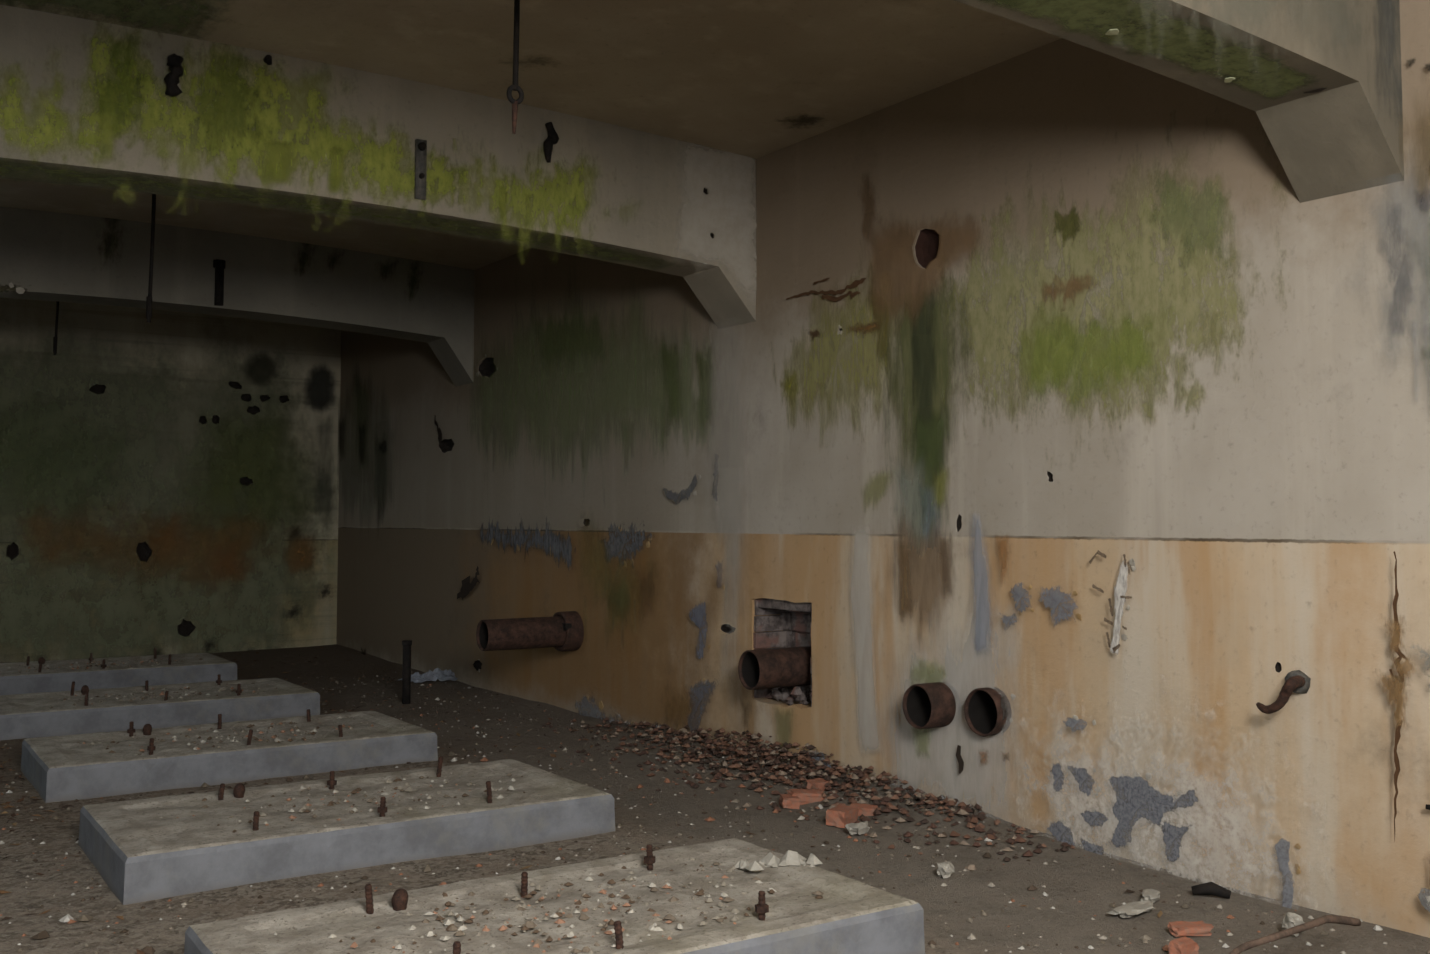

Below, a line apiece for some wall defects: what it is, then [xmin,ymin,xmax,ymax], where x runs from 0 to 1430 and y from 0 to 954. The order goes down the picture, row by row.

damp [863,181,975,625]
peeling [1001,583,1082,629]
peeling [1027,715,1301,909]
crack [1389,551,1407,840]